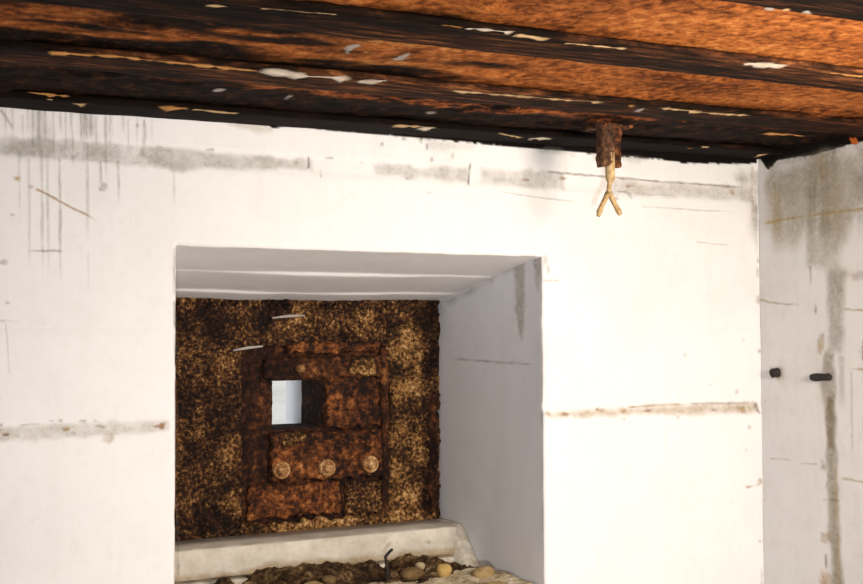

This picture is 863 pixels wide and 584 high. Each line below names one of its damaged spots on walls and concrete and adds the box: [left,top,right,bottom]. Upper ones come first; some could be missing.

peeling [663,108,748,116]
spalling [330,125,597,154]
spalling [621,133,863,170]
corrosion [175,298,438,312]
leakage [824,385,841,584]